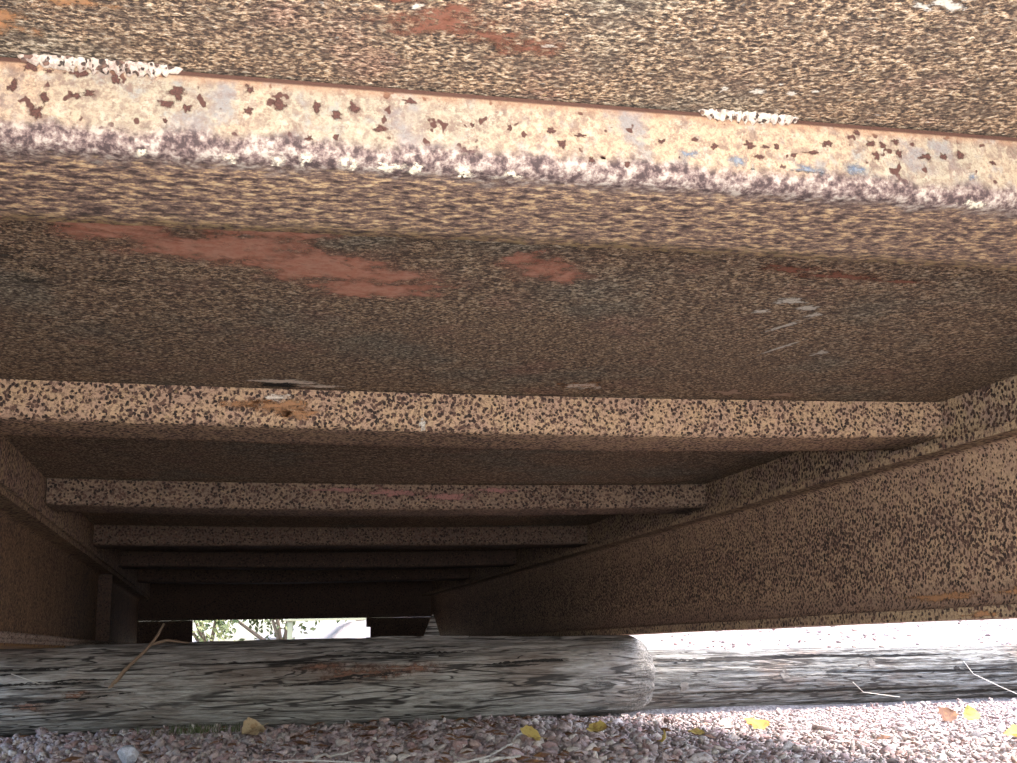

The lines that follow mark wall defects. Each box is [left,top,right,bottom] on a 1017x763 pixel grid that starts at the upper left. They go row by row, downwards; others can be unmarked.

corrosion [0,10,39,34]
corrosion [389,0,562,56]
corrosion [7,61,90,92]
corrosion [29,92,49,119]
corrosion [157,86,192,123]
corrosion [331,99,361,119]
corrosion [744,140,779,159]
corrosion [791,140,833,157]
corrosion [853,130,902,160]
corrosion [919,150,965,160]